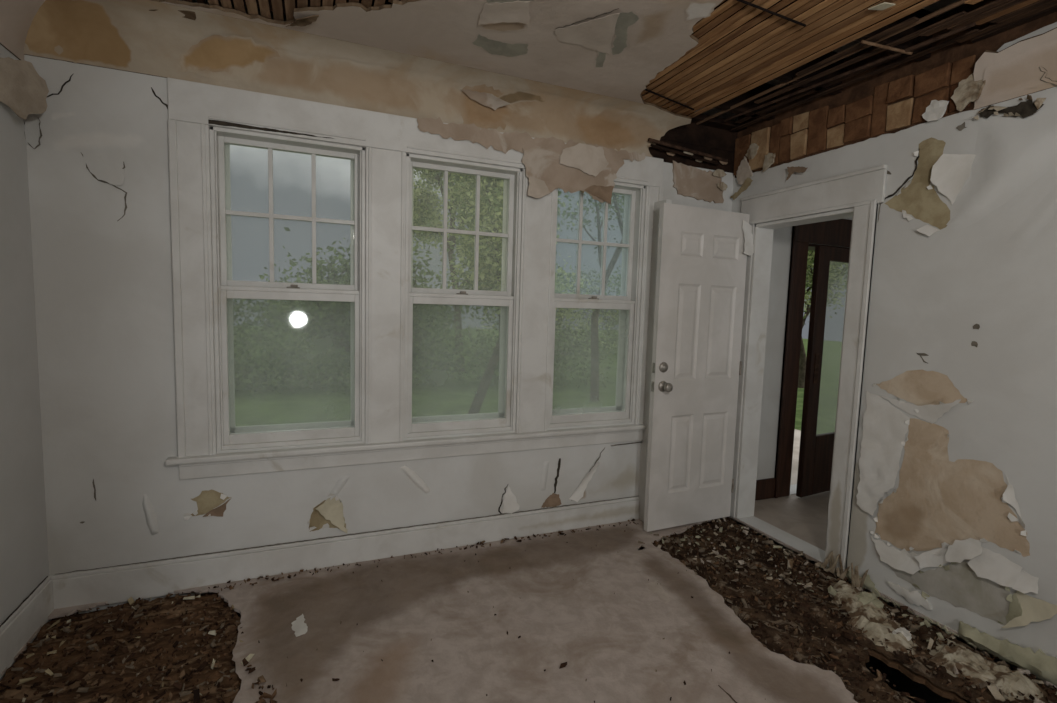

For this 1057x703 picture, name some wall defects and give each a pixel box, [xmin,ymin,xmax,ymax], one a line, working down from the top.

water stain [23,0,133,71]
peeling [595,1,718,68]
water stain [175,35,668,162]
flaking render [730,0,1057,200]
water stain [977,39,1057,103]
crack [81,153,127,221]
peeling [522,143,628,205]
flaking render [877,138,976,236]
peeling [183,489,231,520]
peeling [308,493,348,533]
peeling [541,448,605,508]
flaking render [847,354,1057,686]